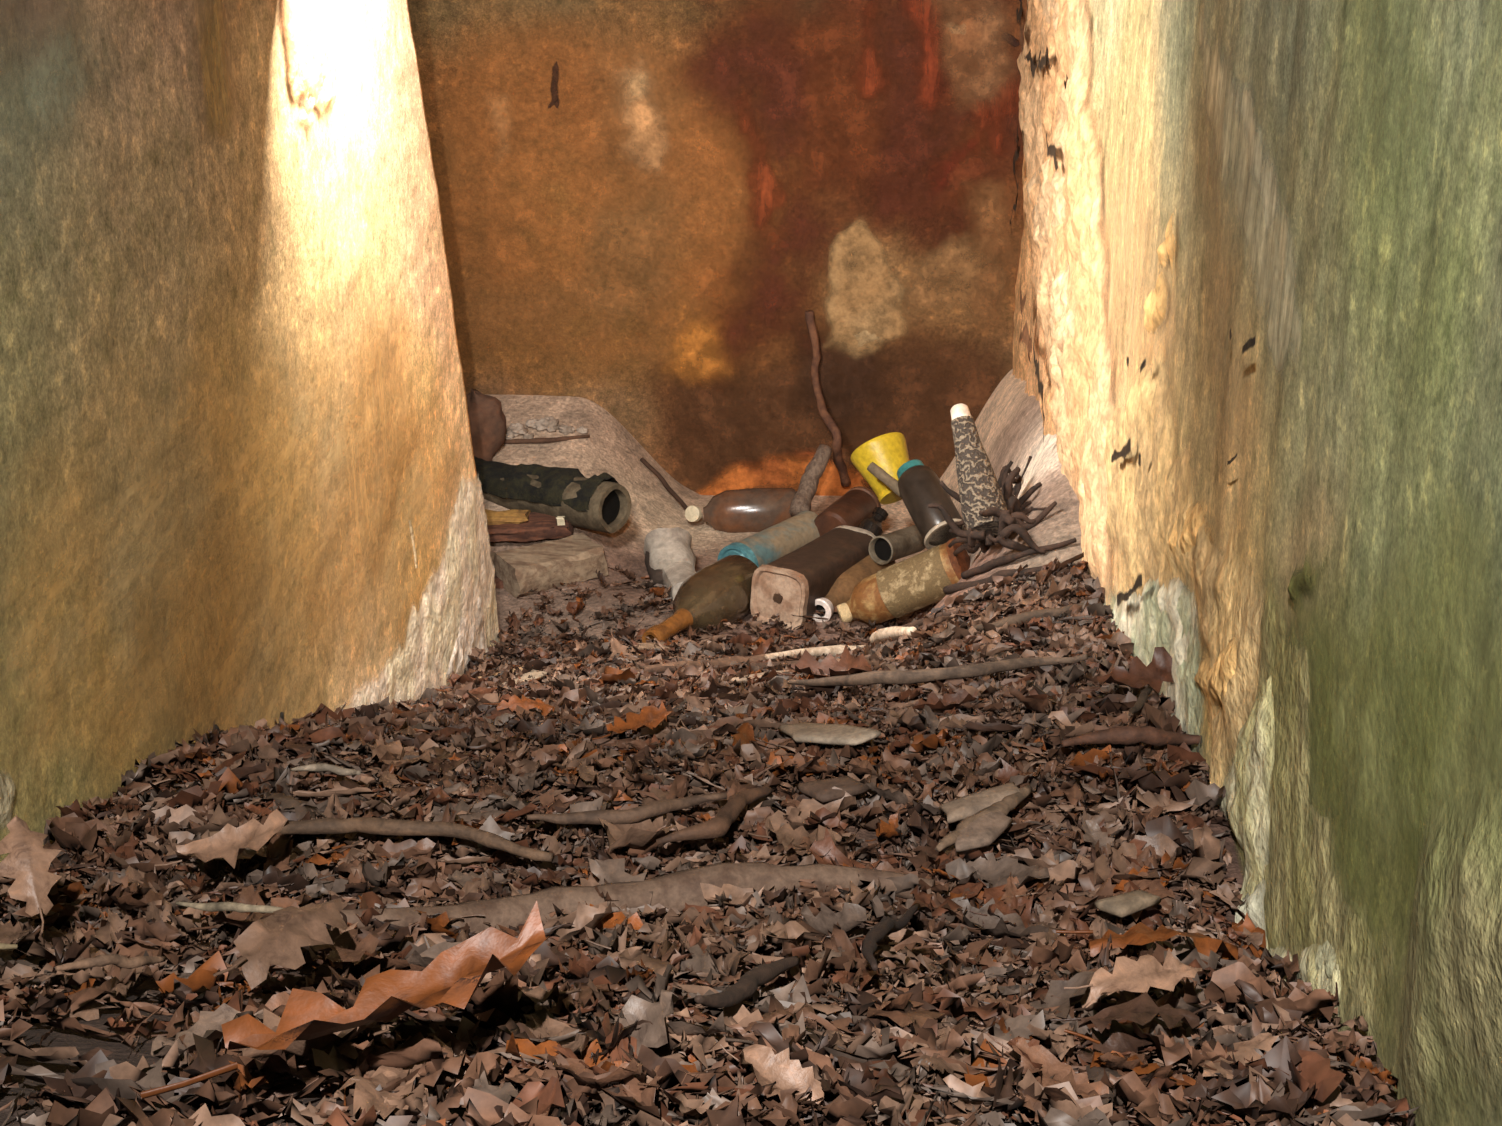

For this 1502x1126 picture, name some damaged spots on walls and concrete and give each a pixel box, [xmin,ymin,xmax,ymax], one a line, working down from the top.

spalling [283,0,338,134]
corrosion [677,0,1023,373]
corrosion [698,453,864,496]